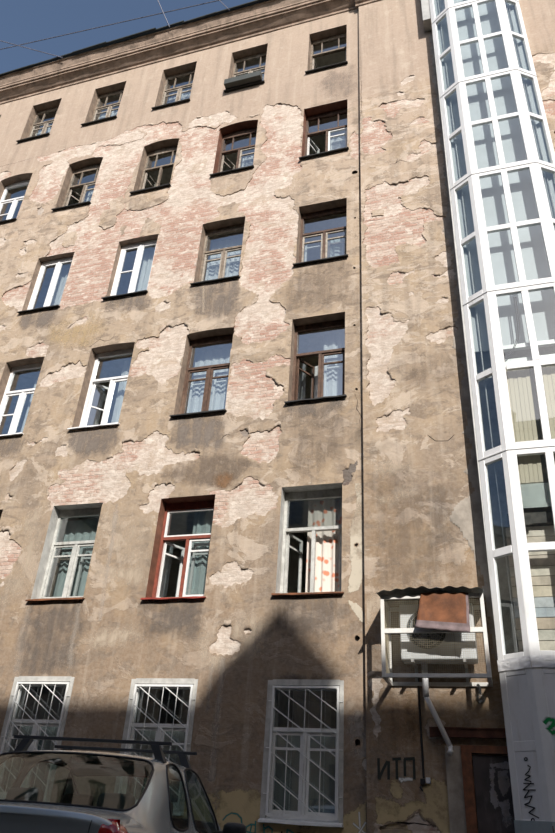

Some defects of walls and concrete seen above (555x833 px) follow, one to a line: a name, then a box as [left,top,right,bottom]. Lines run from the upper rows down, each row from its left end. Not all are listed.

flaking render [349,73,430,159]
flaking render [29,101,304,345]
flaking render [354,175,447,296]
flaking render [25,340,49,358]
flaking render [128,321,191,384]
flaking render [225,354,290,463]
flaking render [47,430,202,514]
flaking render [209,476,278,528]
flaking render [0,526,21,587]
flaking render [209,561,255,588]
flaking render [209,620,241,656]
peeling [172,778,450,833]